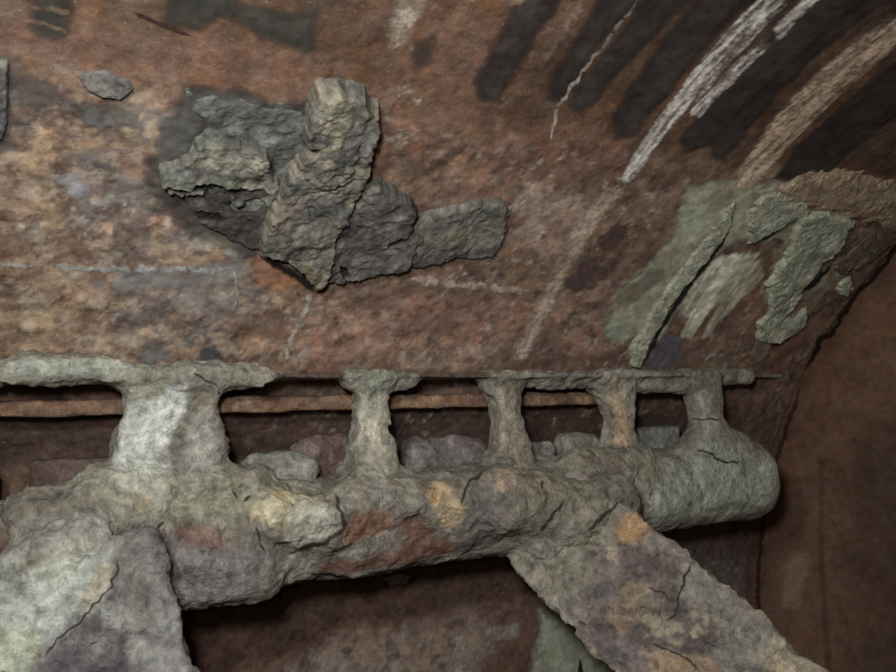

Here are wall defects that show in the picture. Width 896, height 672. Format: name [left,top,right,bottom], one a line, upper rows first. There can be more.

leakage [24,0,71,37]
leakage [169,0,315,50]
leakage [474,0,558,100]
leakage [776,62,896,181]
leakage [513,0,869,369]